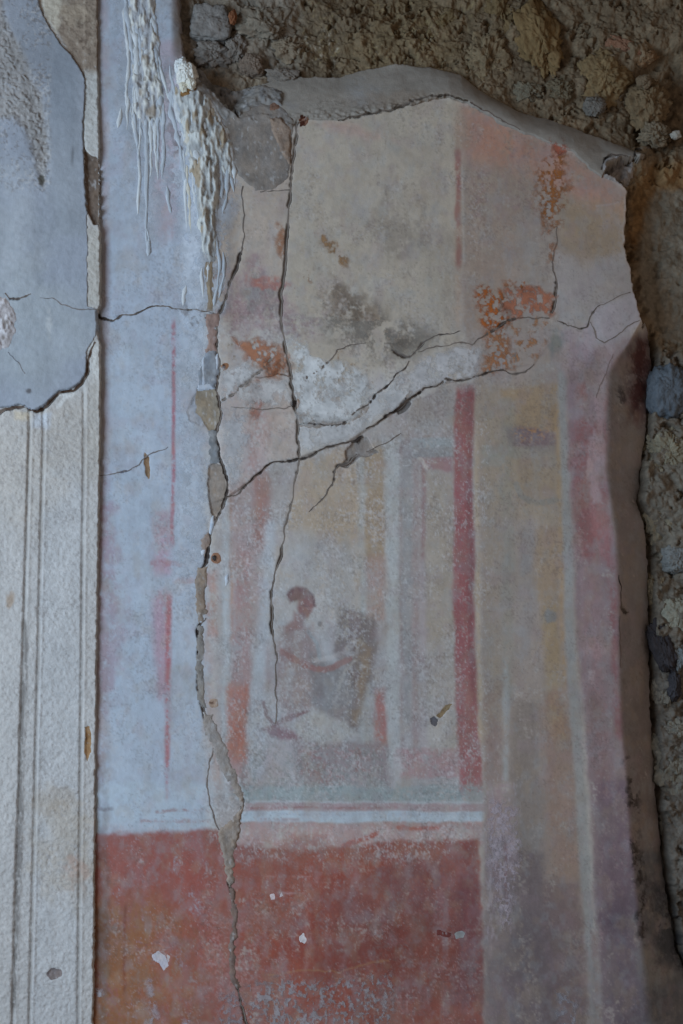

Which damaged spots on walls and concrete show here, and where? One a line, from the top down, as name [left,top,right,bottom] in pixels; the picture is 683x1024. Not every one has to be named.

crack [338,94,520,130]
spalling [83,147,101,225]
leakage [116,0,238,312]
crack [600,147,650,170]
crack [0,342,96,414]
crack [44,122,640,1024]